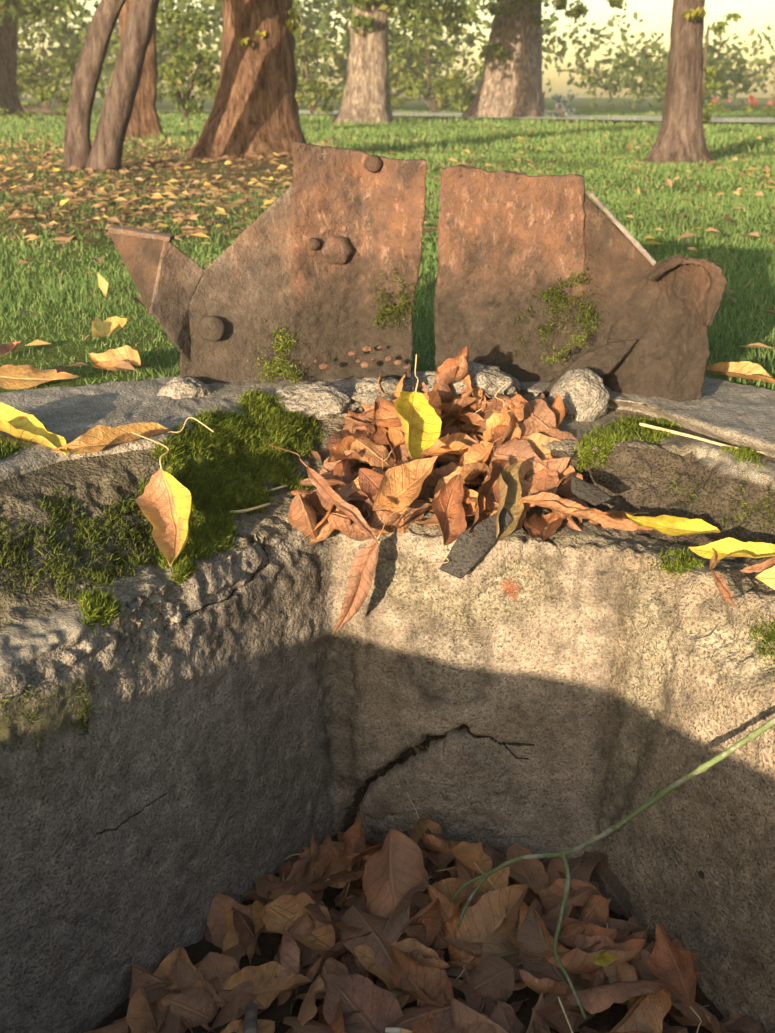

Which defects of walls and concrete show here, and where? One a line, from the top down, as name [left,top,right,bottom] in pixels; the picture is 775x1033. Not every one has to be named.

crack [166,533,269,626]
crack [343,724,534,829]